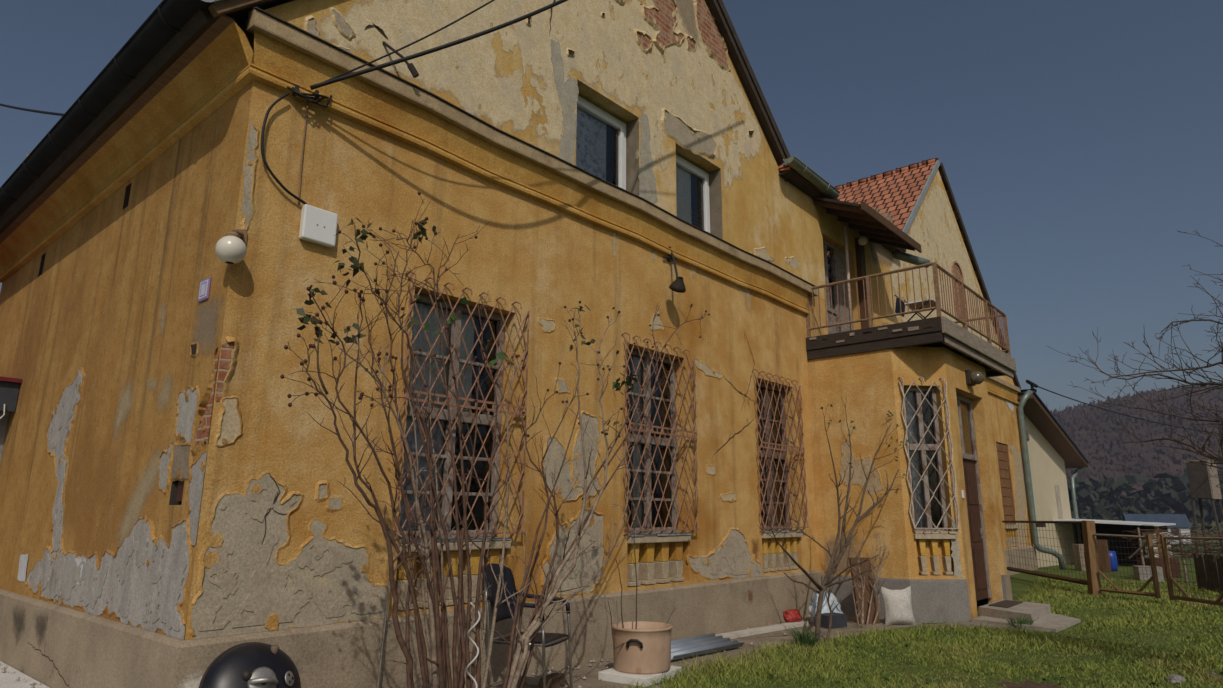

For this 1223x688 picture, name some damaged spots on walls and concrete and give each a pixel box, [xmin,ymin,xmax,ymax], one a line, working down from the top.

peeling [304,0,762,203]
flaking render [17,336,391,640]
flaking render [540,410,605,597]
flaking render [687,527,764,580]